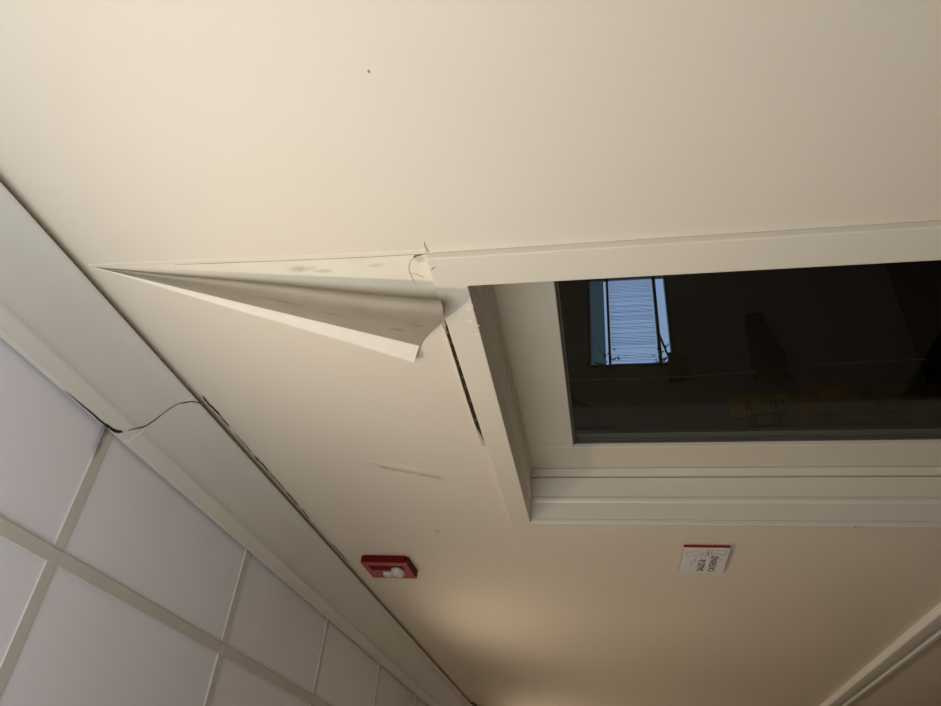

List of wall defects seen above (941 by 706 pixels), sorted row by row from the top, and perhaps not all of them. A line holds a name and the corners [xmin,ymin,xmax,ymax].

peeling [91,253,445,363]
crack [440,320,487,448]
crack [128,395,309,518]